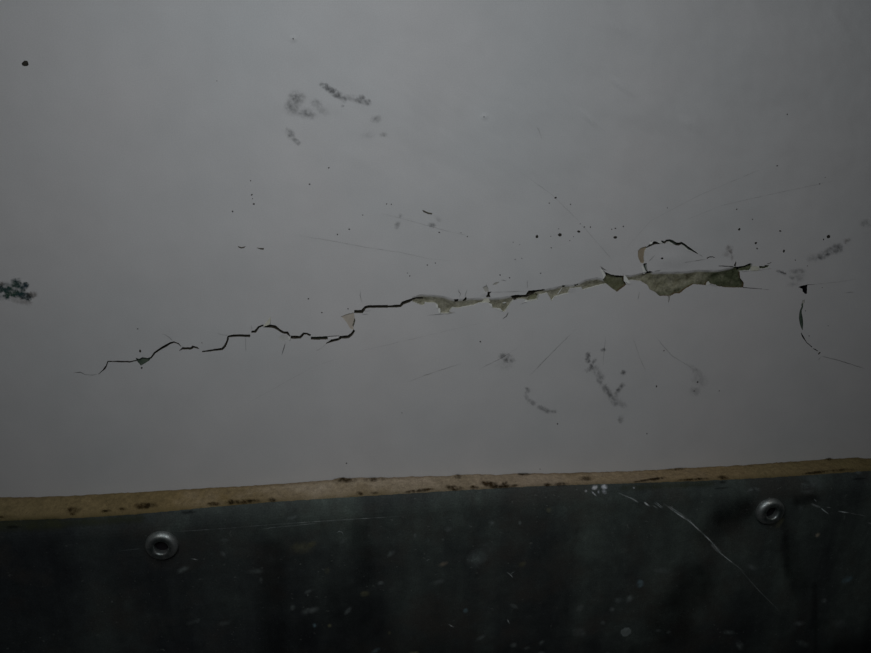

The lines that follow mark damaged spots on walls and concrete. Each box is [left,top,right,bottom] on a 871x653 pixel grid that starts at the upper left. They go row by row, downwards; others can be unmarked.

crack [638,239,771,273]
leakage [0,280,31,300]
spalling [412,260,768,318]
crack [76,296,416,374]
crack [799,300,821,355]